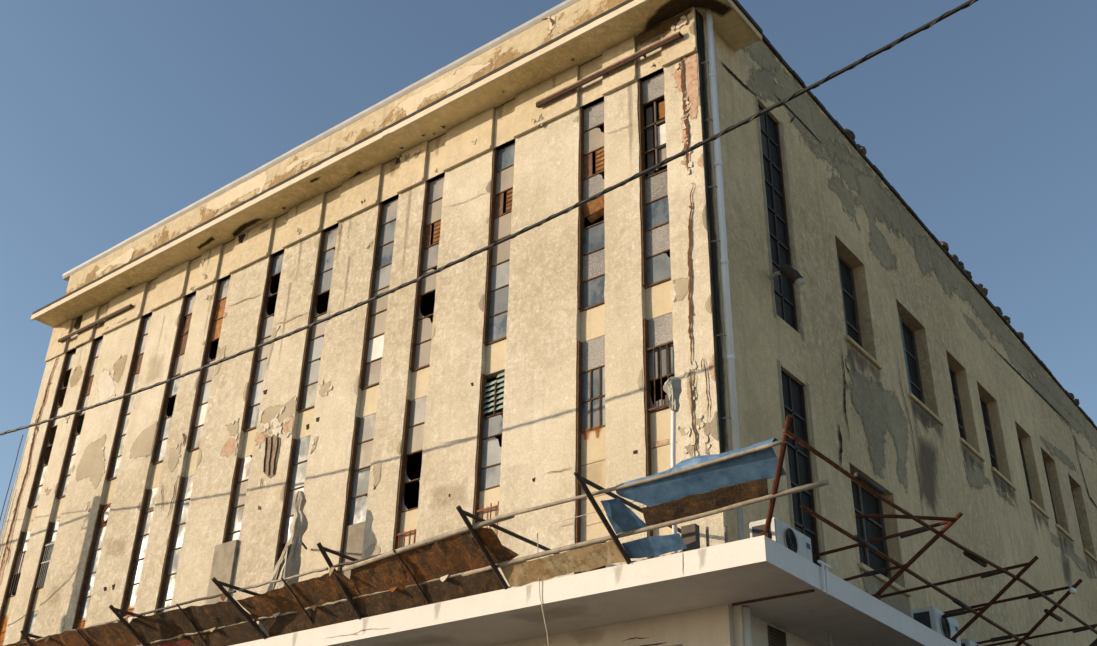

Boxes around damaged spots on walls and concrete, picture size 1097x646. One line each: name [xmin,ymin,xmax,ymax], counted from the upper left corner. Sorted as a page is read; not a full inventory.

spalling [671,15,694,35]
peeling [398,62,491,116]
spalling [650,52,703,168]
crack [720,60,819,140]
spalling [395,149,421,165]
crack [678,54,709,457]
peeling [742,41,1097,492]
peeling [70,365,82,387]
peeling [97,355,127,403]
peeling [72,434,106,489]
spalling [220,418,239,457]
spalling [255,395,296,478]